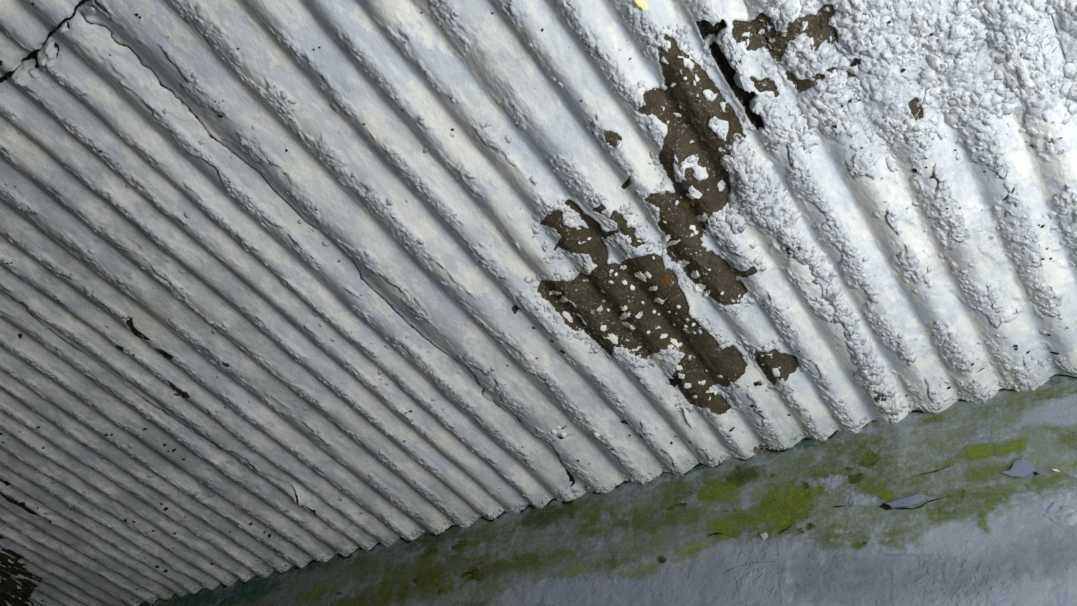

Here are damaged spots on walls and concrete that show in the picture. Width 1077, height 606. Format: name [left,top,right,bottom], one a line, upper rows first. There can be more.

crack [0,0,521,422]
peeling [524,0,1077,428]
peeling [0,535,45,606]